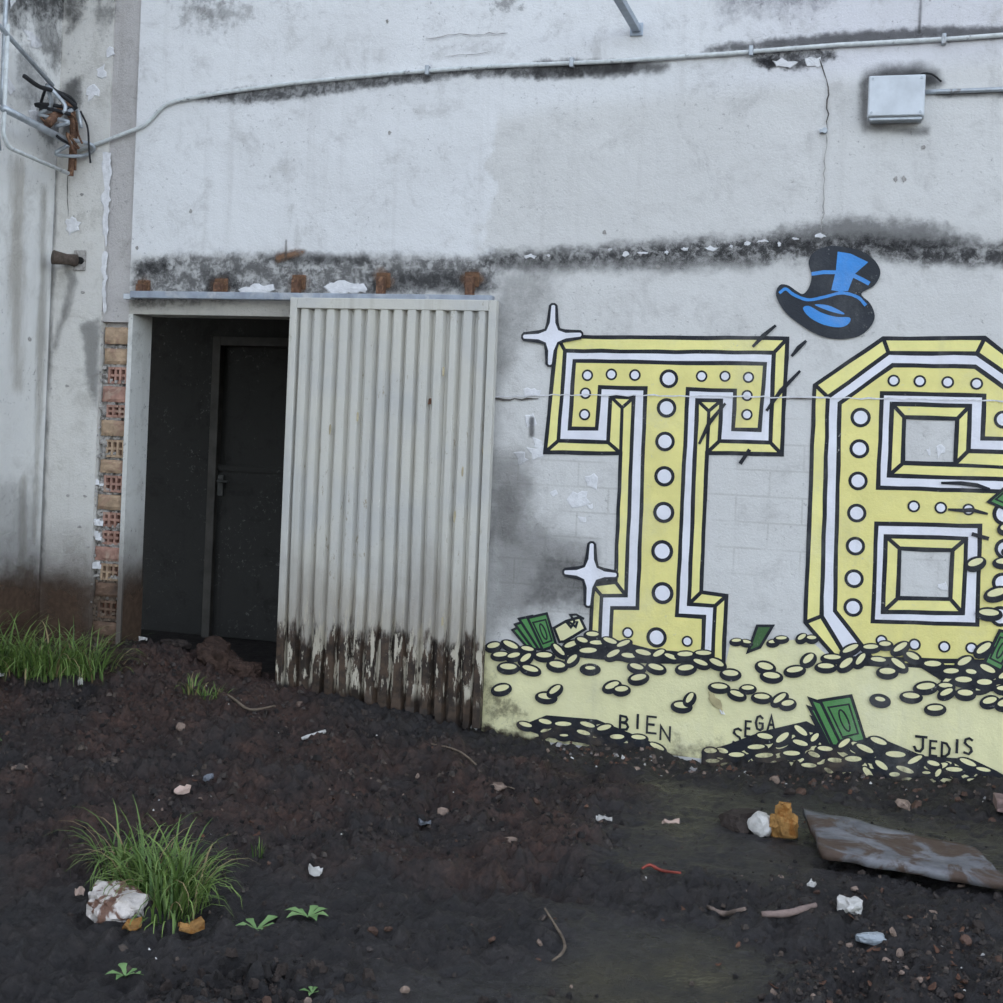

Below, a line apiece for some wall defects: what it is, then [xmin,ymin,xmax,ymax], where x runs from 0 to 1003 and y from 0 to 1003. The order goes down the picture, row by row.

damp [2,0,83,49]
damp [710,11,1003,70]
damp [64,80,80,133]
rust [276,241,305,261]
mould [133,233,1003,306]
peeling [523,388,541,398]
crack [495,394,1003,402]
peeling [514,413,544,466]
peeling [550,473,598,523]